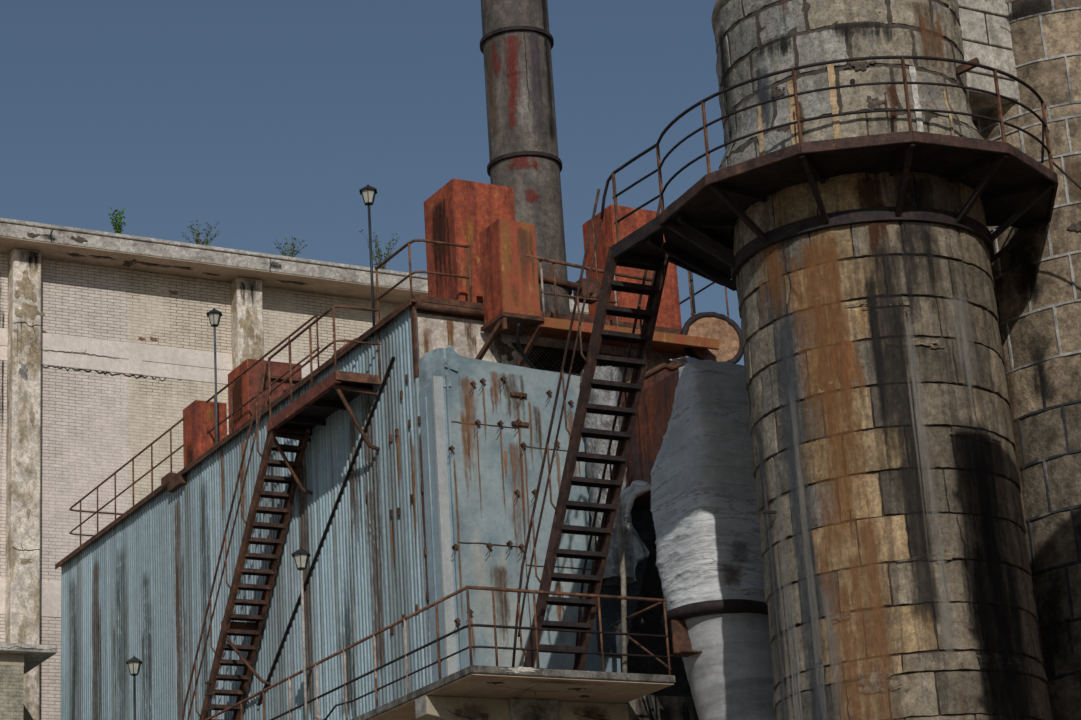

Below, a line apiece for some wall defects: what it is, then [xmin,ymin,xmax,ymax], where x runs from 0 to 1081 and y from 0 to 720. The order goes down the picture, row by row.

rust [858,177,884,208]
rust [864,221,888,252]
peeling [13,270,45,380]
leakage [866,281,886,415]
leakage [895,236,918,475]
rust [454,371,541,588]
leakage [92,564,101,720]